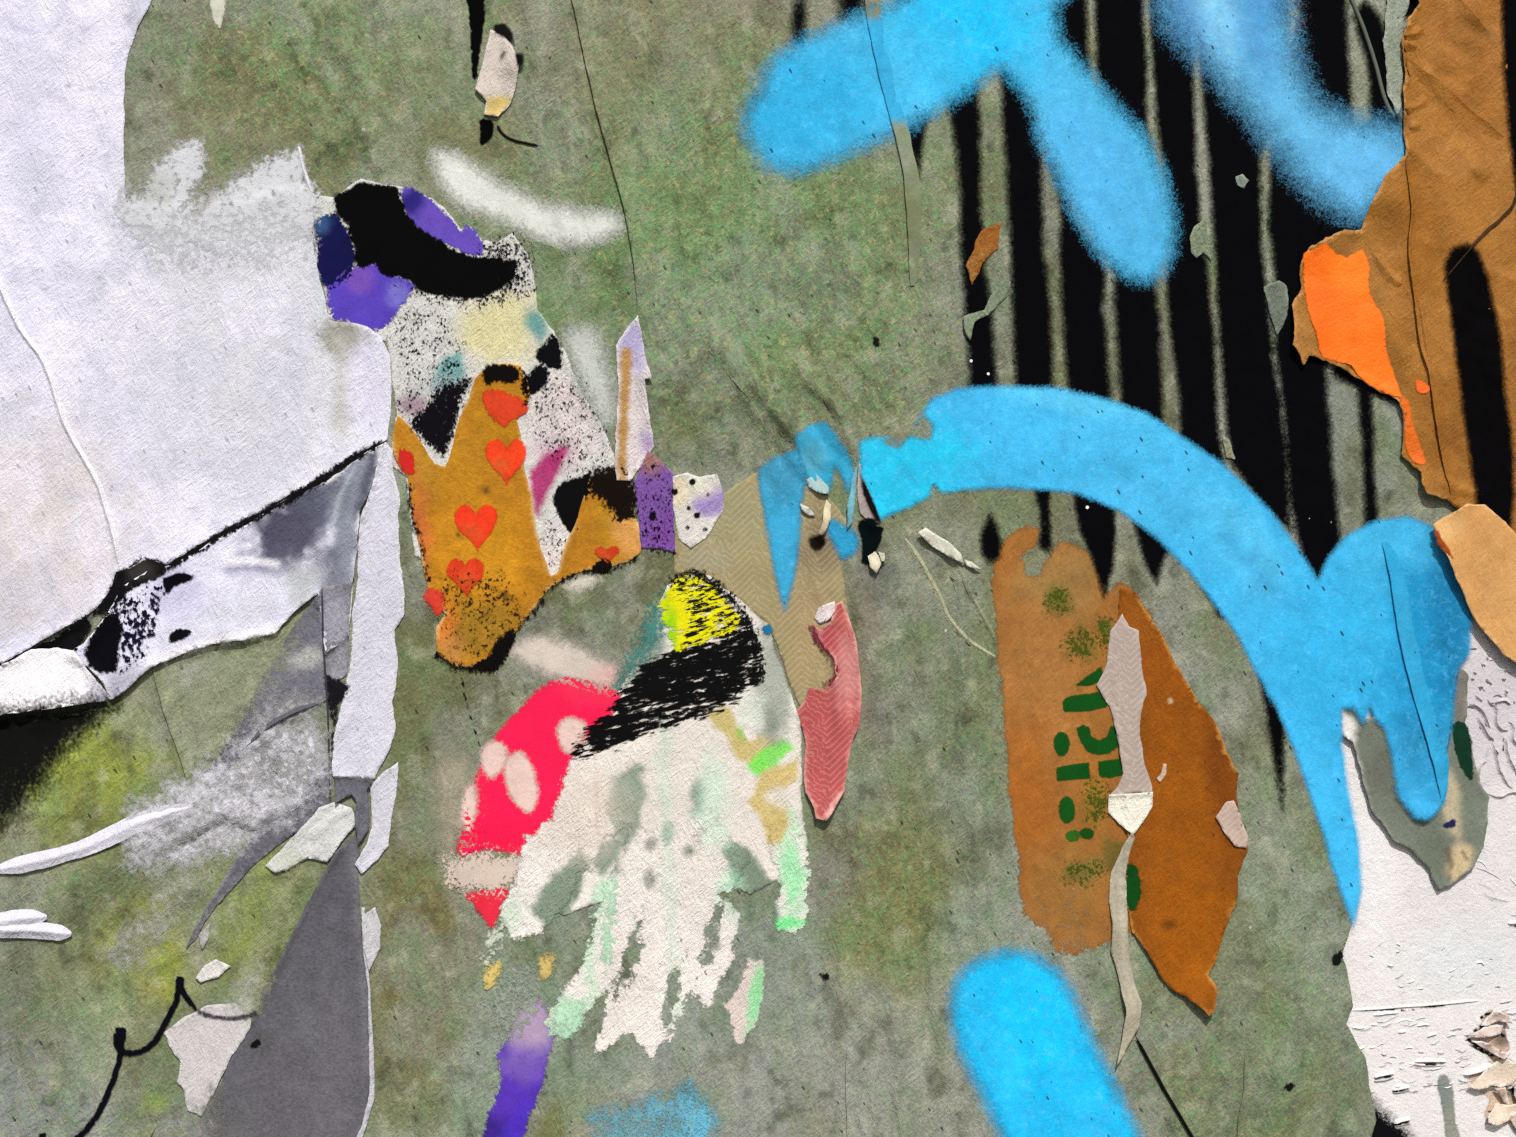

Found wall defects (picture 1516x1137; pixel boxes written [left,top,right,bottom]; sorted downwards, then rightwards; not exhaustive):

peeling [1374,1070,1410,1095]
peeling [1413,1010,1516,1137]
peeling [1394,1116,1411,1129]